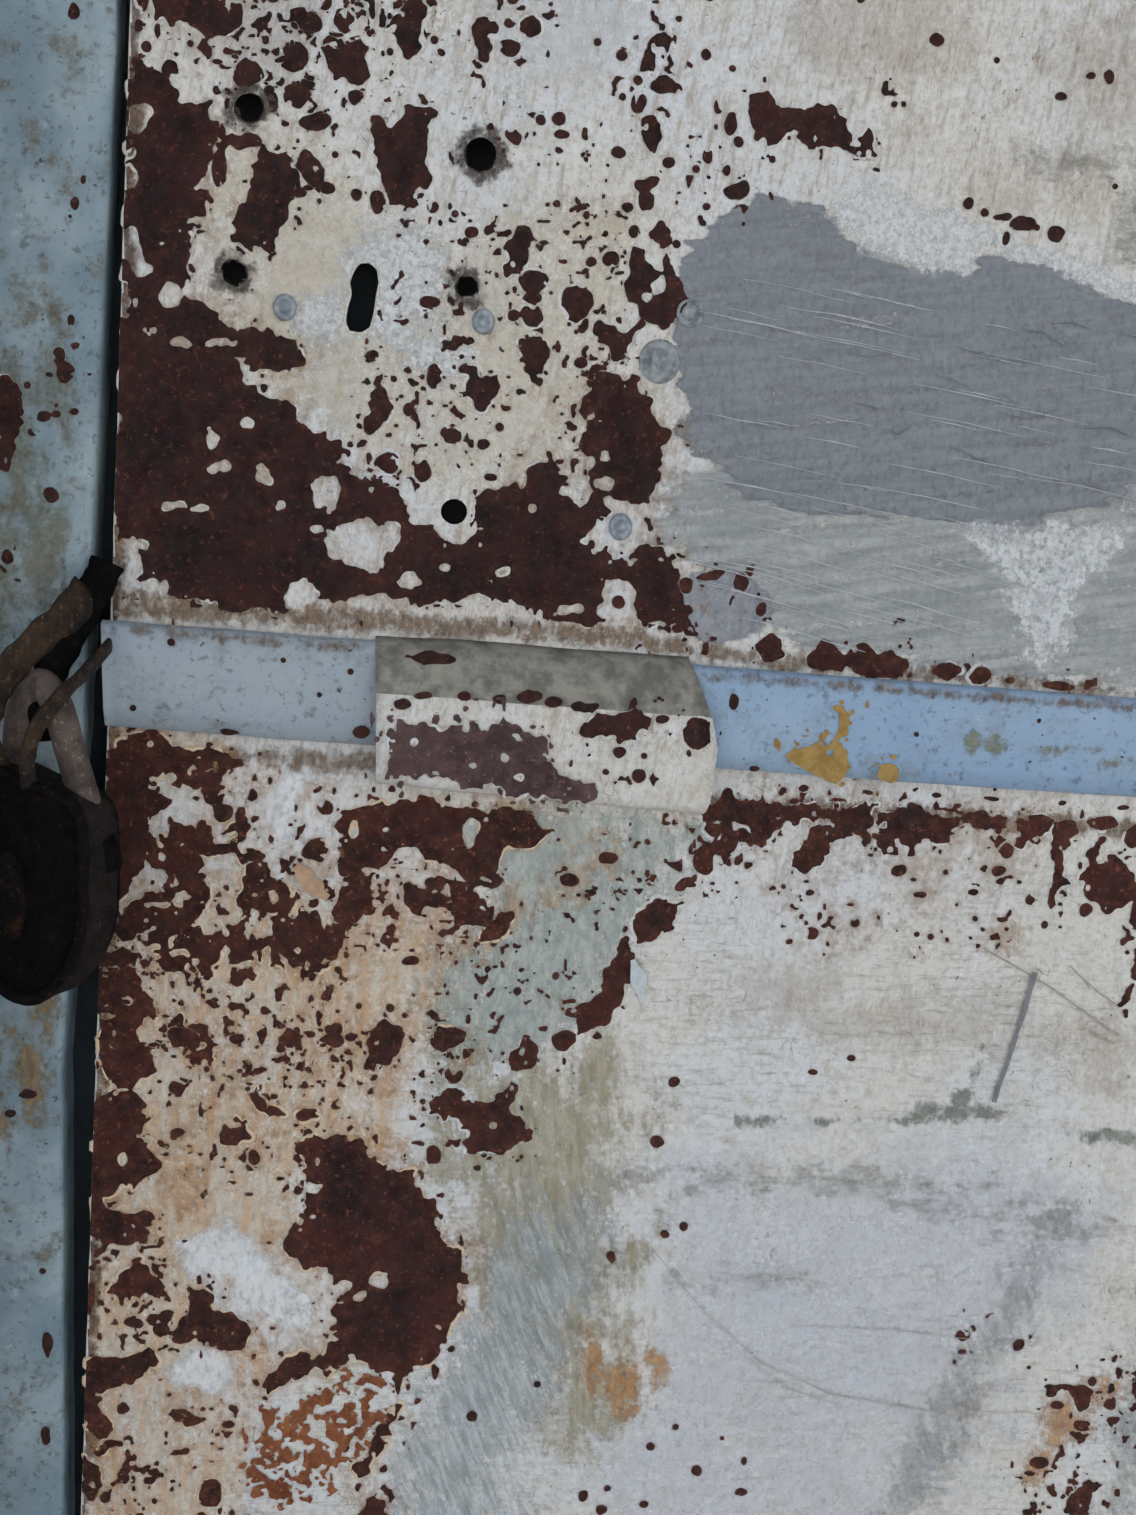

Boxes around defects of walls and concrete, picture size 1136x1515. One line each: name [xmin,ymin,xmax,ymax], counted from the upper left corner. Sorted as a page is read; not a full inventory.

corrosion [68,2,80,19]
corrosion [0,305,92,630]
corrosion [62,175,86,231]
corrosion [114,0,1114,695]
corrosion [81,690,1136,1515]